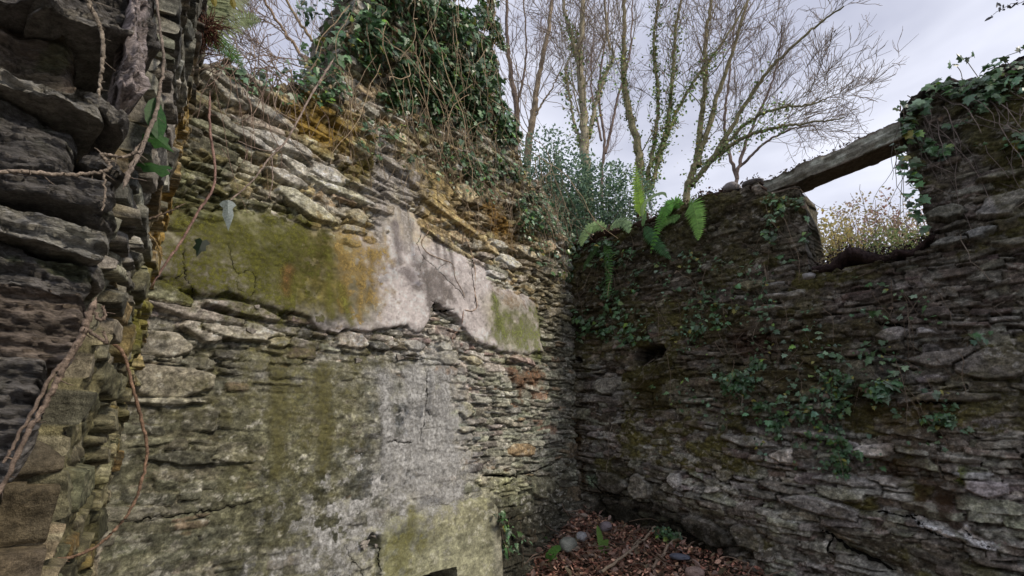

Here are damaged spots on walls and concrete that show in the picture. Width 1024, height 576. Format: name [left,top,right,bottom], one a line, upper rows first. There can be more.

flaking render [230,302,479,365]
damp [291,345,477,576]
flaking render [453,370,574,504]